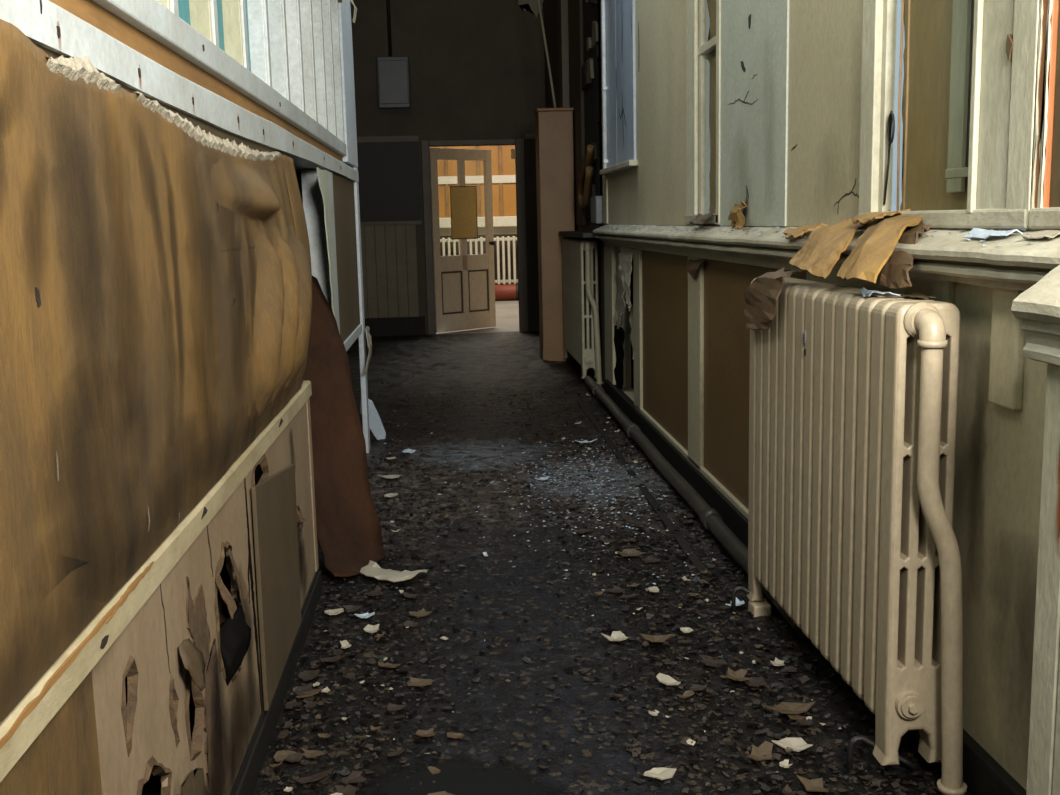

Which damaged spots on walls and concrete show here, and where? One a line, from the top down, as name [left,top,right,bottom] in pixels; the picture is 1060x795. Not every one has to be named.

peeling [45,55,281,162]
peeling [215,549,250,619]
peeling [175,576,222,795]